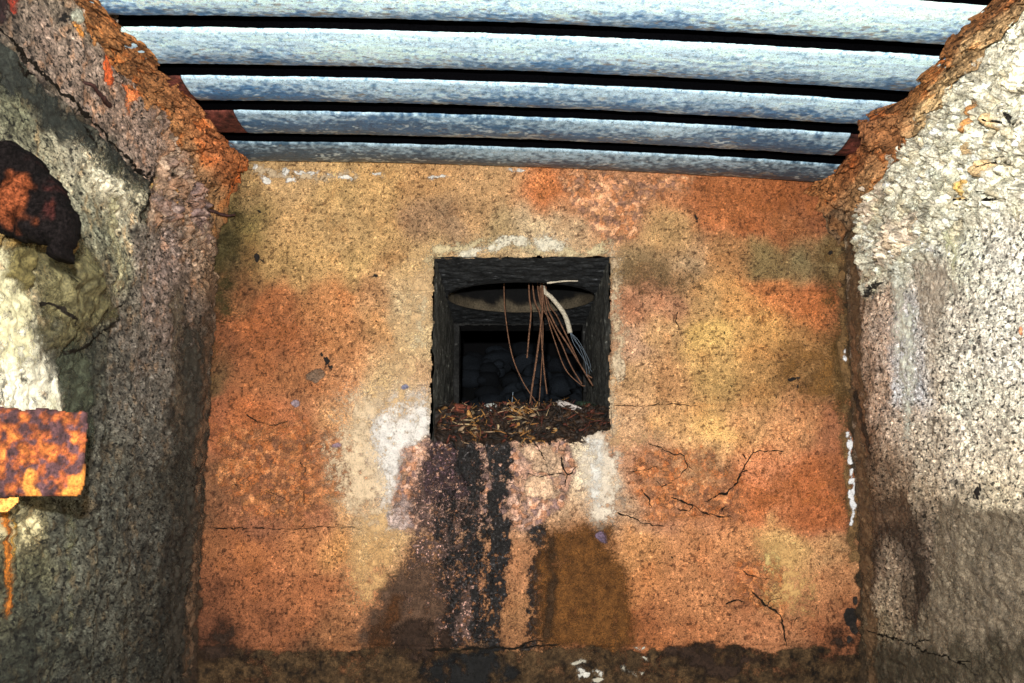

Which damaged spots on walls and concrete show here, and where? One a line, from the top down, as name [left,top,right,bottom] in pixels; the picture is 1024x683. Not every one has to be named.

leakage [213,192,245,315]
crack [213,462,367,530]
leakage [160,229,1024,683]
crack [617,443,784,527]
rust [0,496,19,615]
crack [726,570,798,646]
crack [867,630,978,675]